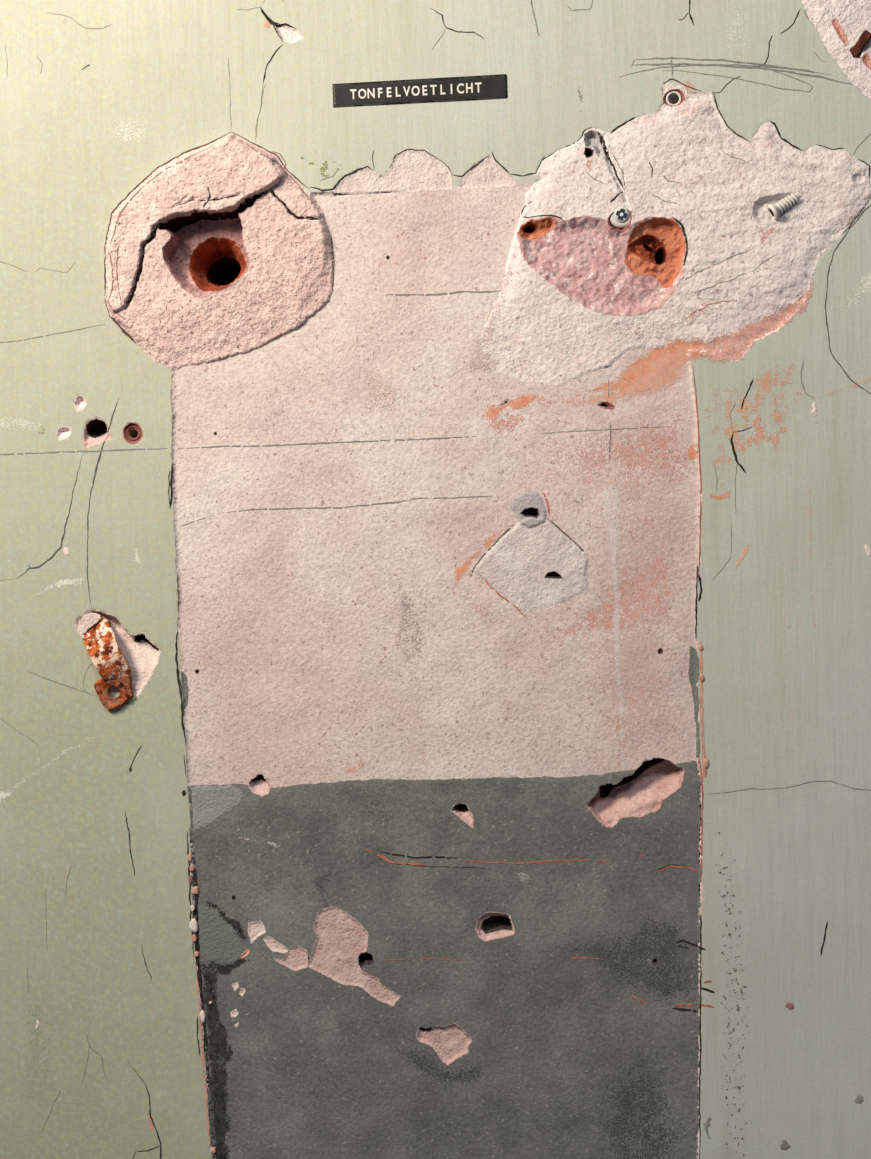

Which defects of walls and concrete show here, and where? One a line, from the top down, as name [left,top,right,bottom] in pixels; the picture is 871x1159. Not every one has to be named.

crack [47,12,111,29]
crack [663,10,808,161]
spalling [801,0,871,100]
crack [104,7,775,344]
crack [714,121,871,578]
crack [0,399,119,604]
spalling [75,609,161,702]
flaking render [168,82,871,1159]
crack [715,781,871,794]